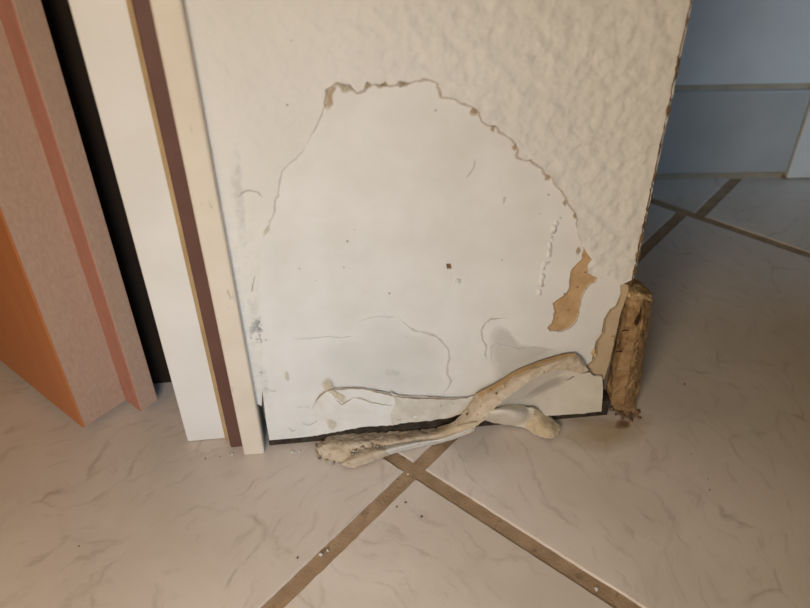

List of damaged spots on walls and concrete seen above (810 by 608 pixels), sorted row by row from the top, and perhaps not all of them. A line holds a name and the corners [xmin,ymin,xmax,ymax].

peeling [259,0,691,468]